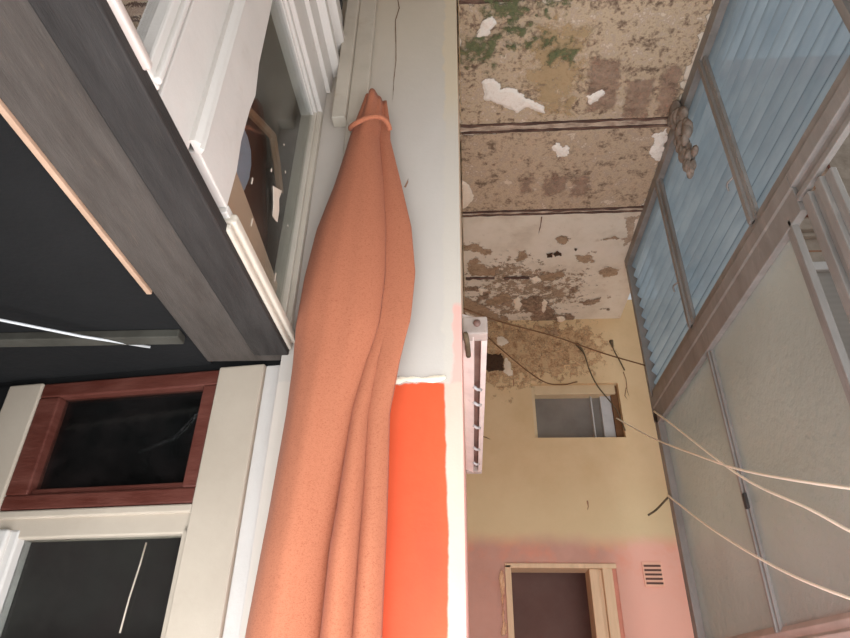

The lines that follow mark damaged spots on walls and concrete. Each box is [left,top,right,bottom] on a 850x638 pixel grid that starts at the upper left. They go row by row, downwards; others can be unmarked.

flaking render [475,16,497,37]
flaking render [482,78,545,113]
flaking render [586,58,682,119]
flaking render [552,142,570,157]
flaking render [649,128,668,161]
peeling [461,180,474,214]
flaking render [544,176,590,196]
flaking render [462,236,619,322]
spalling [486,353,504,372]